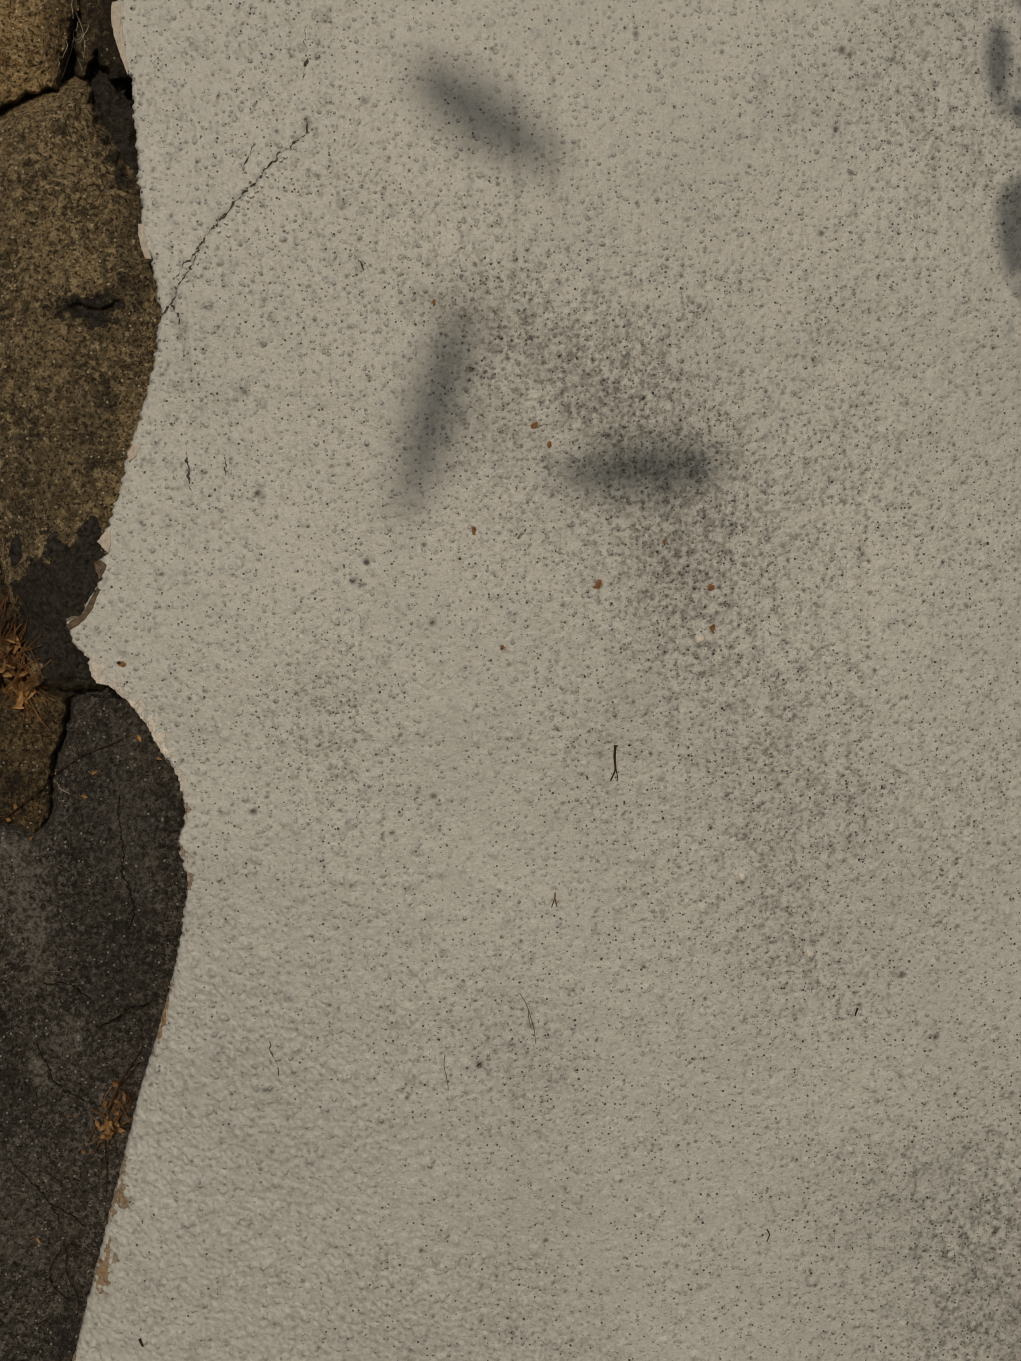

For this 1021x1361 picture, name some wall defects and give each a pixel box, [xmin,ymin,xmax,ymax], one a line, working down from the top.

crack [162,117,308,327]